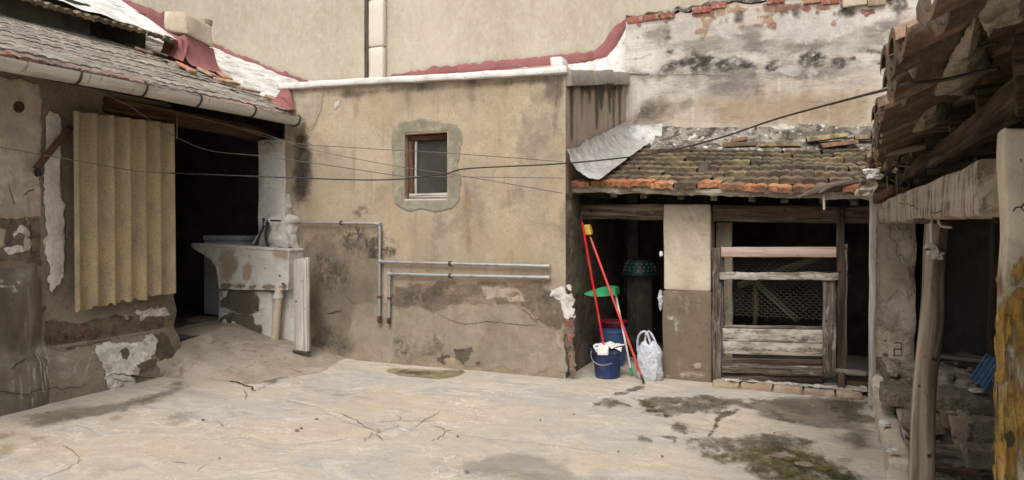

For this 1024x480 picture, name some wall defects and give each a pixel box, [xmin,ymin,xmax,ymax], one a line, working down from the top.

water stain [663,11,846,92]
peeling [692,3,875,44]
peeling [0,111,66,292]
mould [295,134,311,200]
flaking render [45,306,174,390]
water stain [303,229,395,347]
crack [352,302,537,329]
flaking render [391,280,577,377]
peeling [993,256,1024,480]
crack [231,378,451,441]
water stain [741,396,875,448]